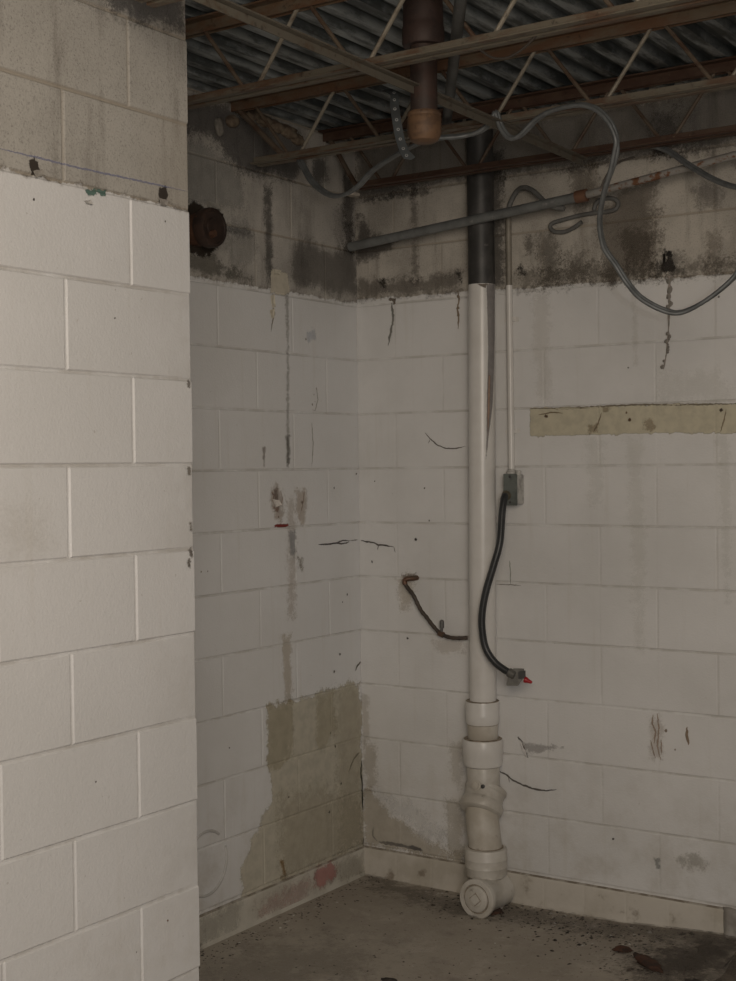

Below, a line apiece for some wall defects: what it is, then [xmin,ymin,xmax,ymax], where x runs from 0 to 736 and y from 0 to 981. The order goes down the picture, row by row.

water stain [187,106,301,181]
water stain [356,221,391,263]